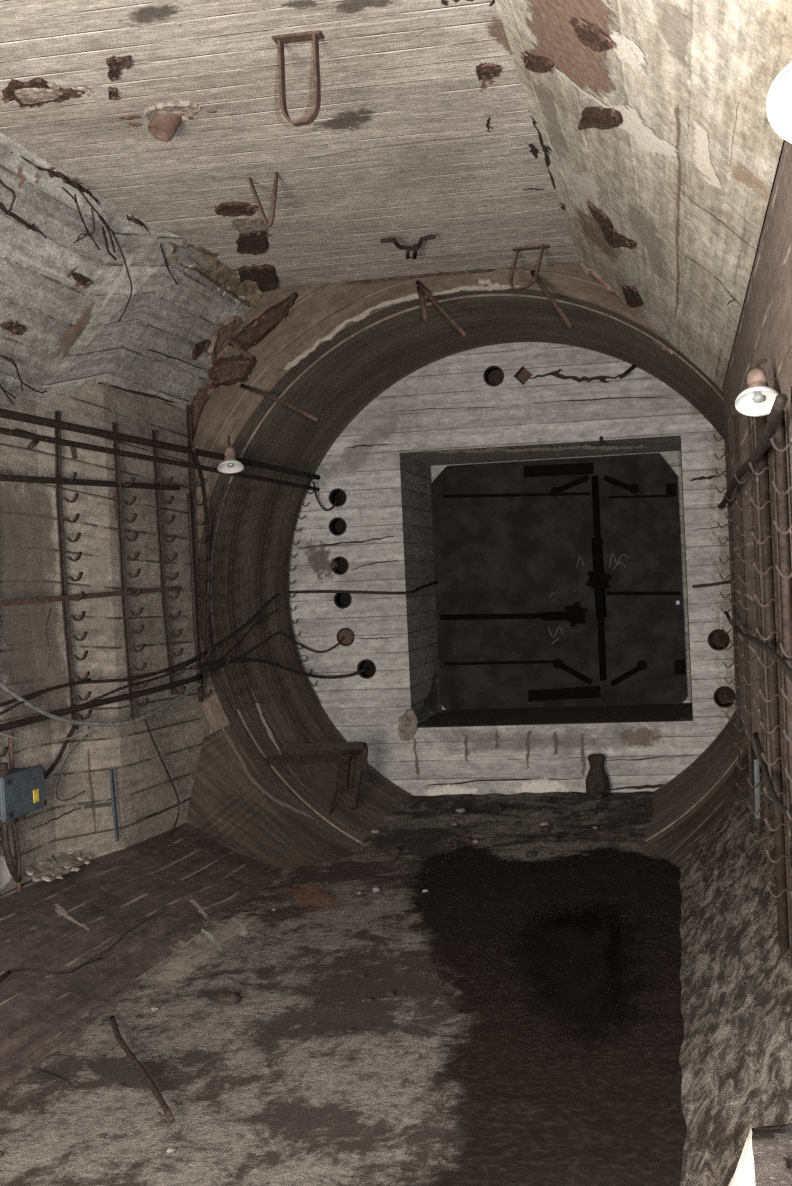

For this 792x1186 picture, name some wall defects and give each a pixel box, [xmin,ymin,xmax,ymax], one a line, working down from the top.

spalling [2,77,92,108]
spalling [106,55,133,100]
spalling [476,63,502,92]
peeling [520,0,623,131]
peeling [119,115,141,127]
crack [0,202,47,239]
spalling [587,200,637,249]
spalling [167,201,319,441]
crack [395,369,657,412]